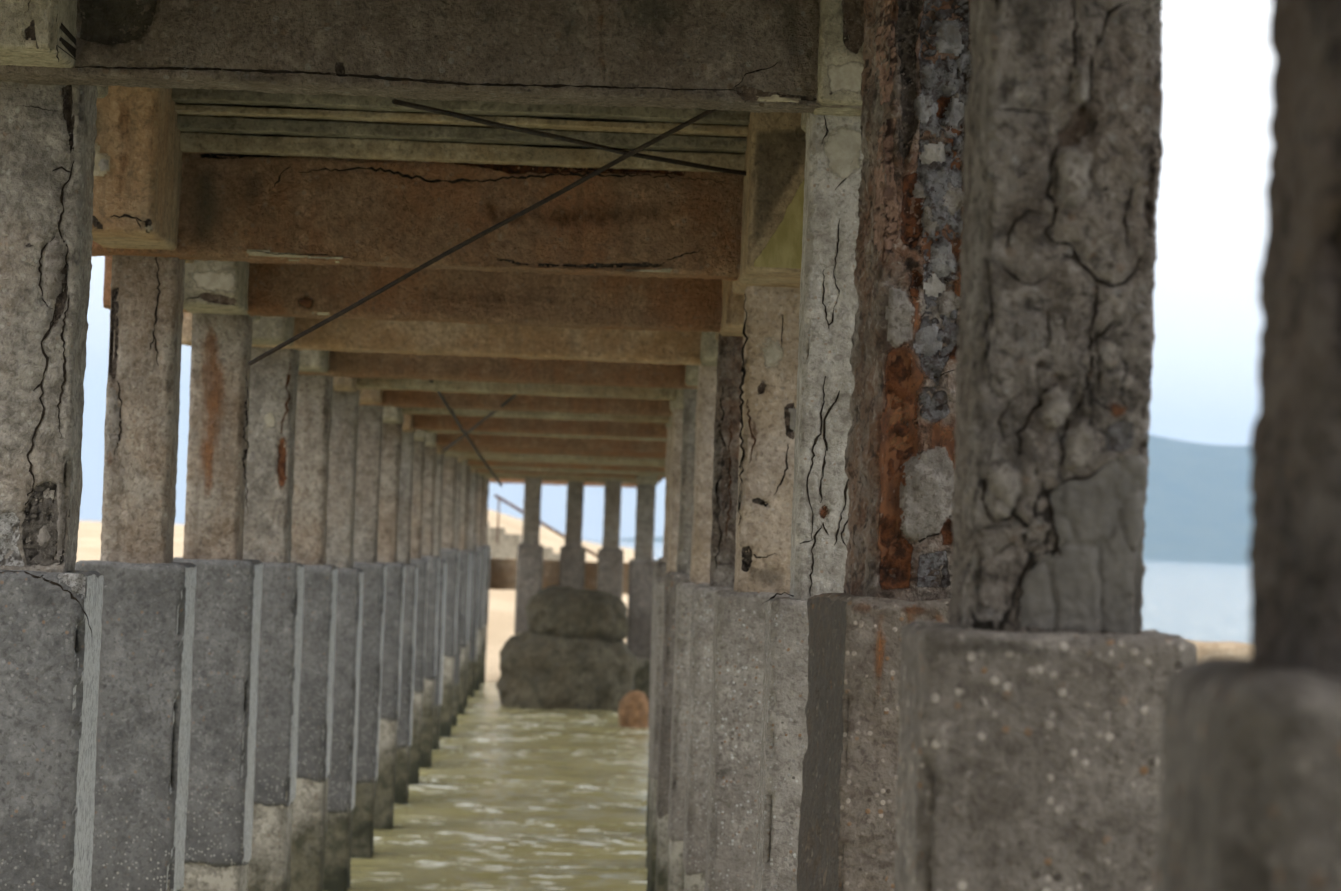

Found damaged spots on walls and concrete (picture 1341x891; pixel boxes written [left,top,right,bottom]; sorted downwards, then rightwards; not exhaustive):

crack [274,166,730,188]